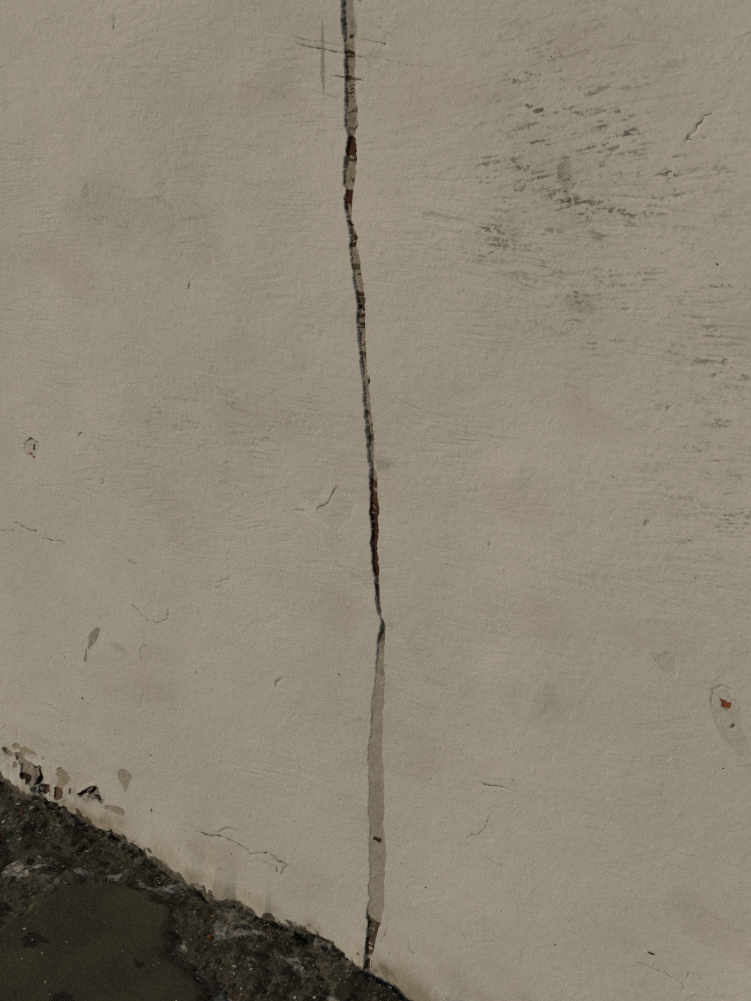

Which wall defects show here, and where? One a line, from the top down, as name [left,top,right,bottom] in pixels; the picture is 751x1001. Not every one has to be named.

spalling [2,742,124,816]
crack [340,0,412,971]